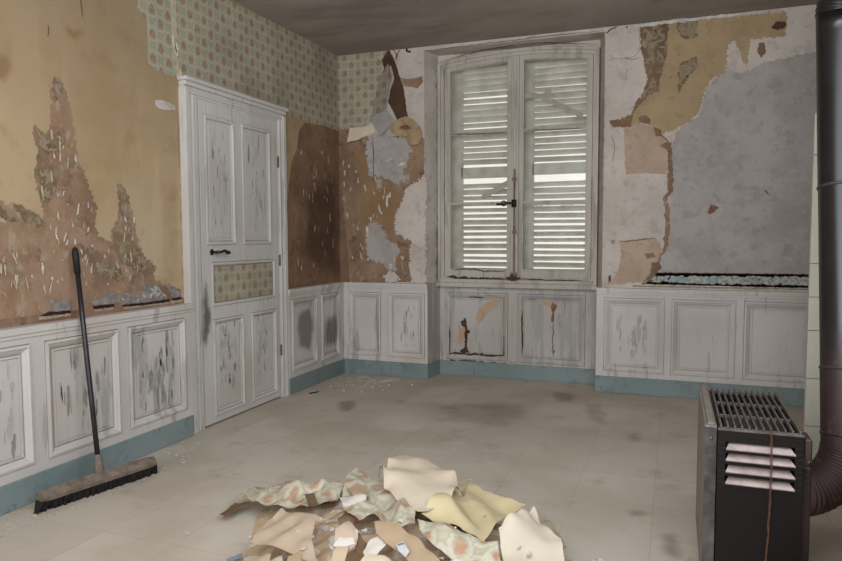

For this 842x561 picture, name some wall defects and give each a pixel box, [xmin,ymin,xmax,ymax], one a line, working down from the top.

peeling [0,76,184,329]
peeling [135,0,428,289]
peeling [528,299,557,322]
flaking render [608,10,819,290]